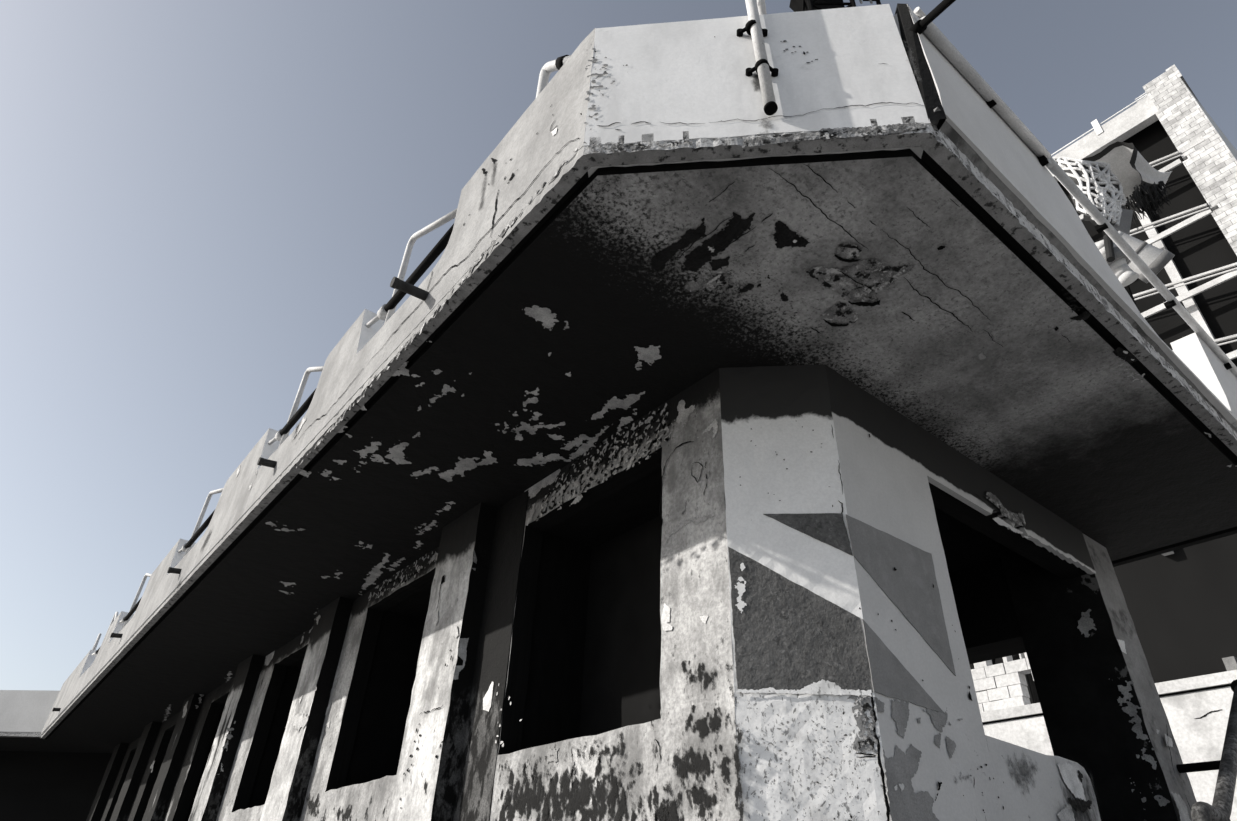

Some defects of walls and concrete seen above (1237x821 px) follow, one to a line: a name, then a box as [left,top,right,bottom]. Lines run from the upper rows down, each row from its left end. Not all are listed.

spalling [742,122,927,148]
peeling [296,44,695,482]
crack [301,102,924,436]
spalling [651,212,770,294]
spalling [773,221,810,249]
spalling [806,257,915,327]
crack [769,164,1003,347]
peeling [495,387,695,526]
peeling [355,501,456,601]
leakage [453,490,745,821]
peeling [735,563,747,613]
peeling [736,679,963,821]